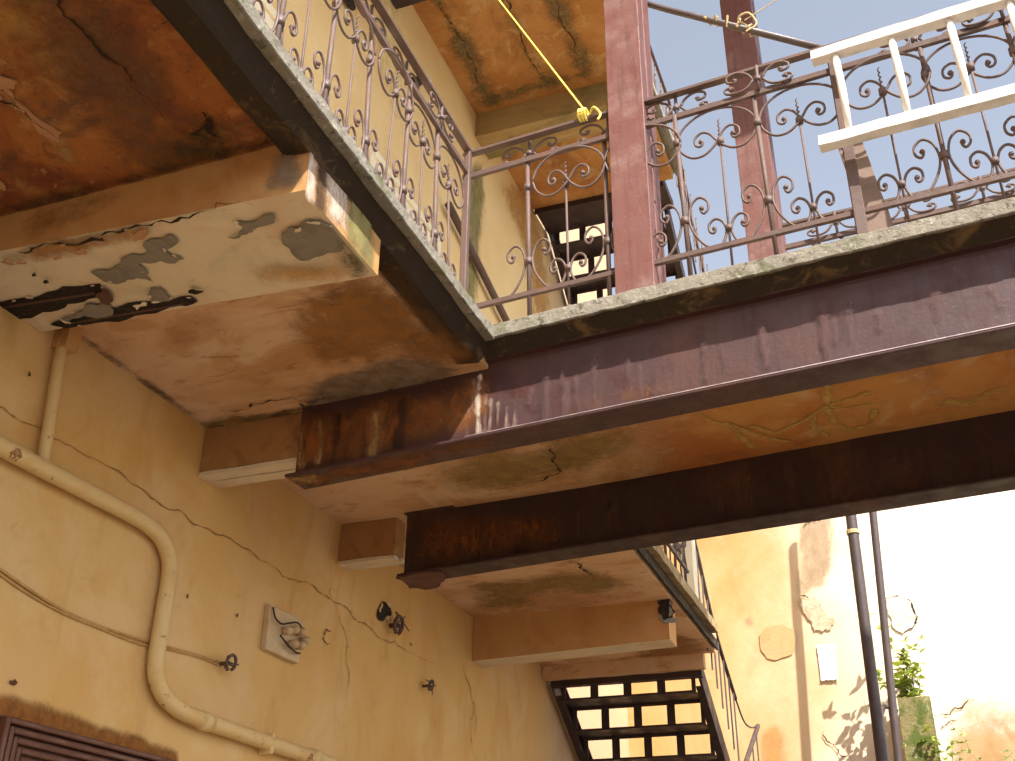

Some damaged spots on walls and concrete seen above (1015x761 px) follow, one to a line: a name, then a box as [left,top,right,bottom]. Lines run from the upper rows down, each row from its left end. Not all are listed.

crack [56,0,163,117]
peeling [0,75,72,160]
crack [187,112,220,138]
spalling [0,228,203,328]
peeling [228,214,345,263]
crack [231,393,340,412]
damp [208,281,465,429]
rust [288,379,490,485]
crack [0,406,436,705]
spalling [798,596,835,631]